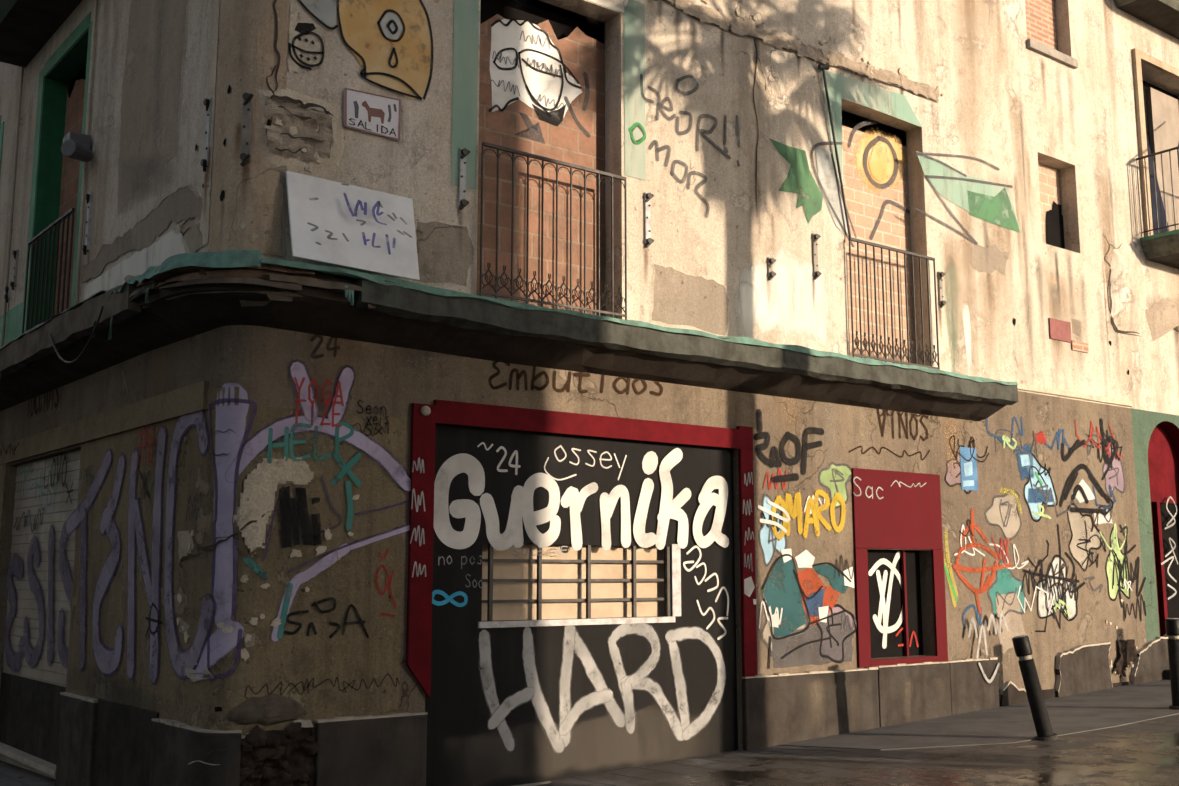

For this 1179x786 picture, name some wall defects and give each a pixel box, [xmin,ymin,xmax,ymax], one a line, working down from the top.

peeling [117,0,189,217]
crack [266,0,280,126]
peeling [82,185,203,283]
spalling [226,88,345,257]
spalling [232,451,319,558]
spalling [290,528,341,560]